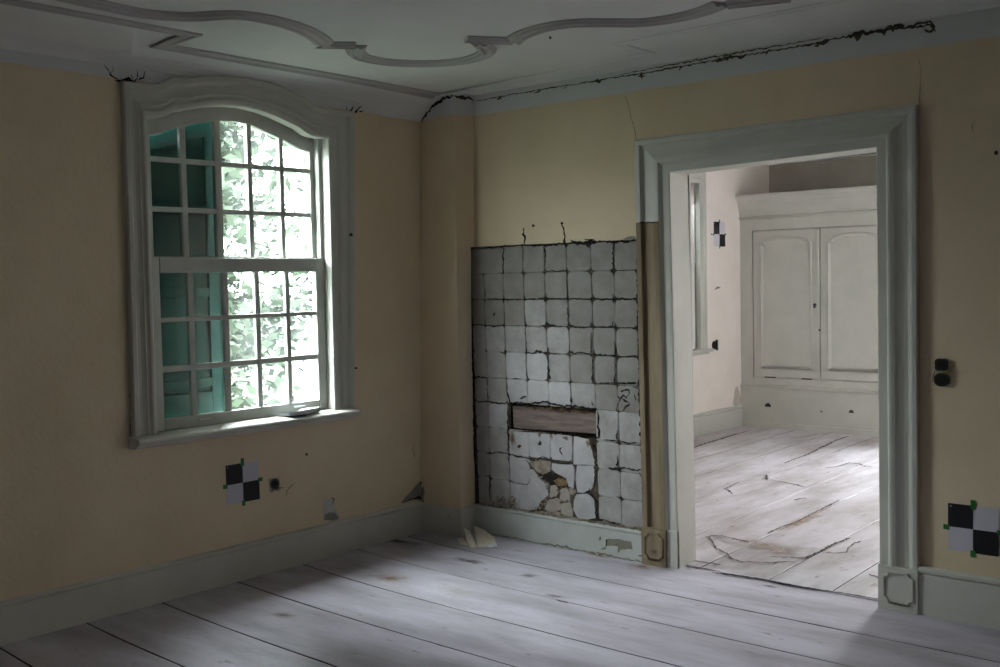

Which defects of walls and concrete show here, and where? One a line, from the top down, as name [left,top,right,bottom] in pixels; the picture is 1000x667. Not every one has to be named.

crack [105,66,145,82]
crack [421,20,936,138]
crack [471,225,642,525]
flaking render [401,482,425,503]
spalling [530,459,577,518]
crack [698,436,878,599]
peeling [599,536,642,559]